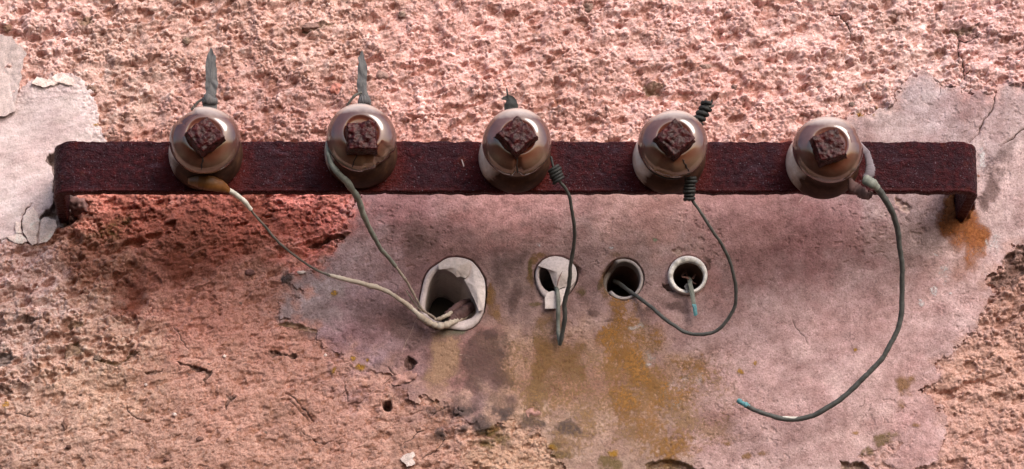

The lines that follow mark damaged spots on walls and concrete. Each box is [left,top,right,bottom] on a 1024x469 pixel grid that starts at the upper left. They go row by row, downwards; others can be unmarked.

peeling [0,34,74,116]
spalling [642,80,666,97]
crack [935,32,980,95]
peeling [7,153,77,245]
spalling [309,234,345,249]
corrosion [936,194,990,264]
water stain [425,329,506,388]
flaking render [914,246,1024,469]
water stain [453,407,581,435]
peeling [400,452,415,467]
spalling [645,459,704,469]
flaking render [840,440,904,469]